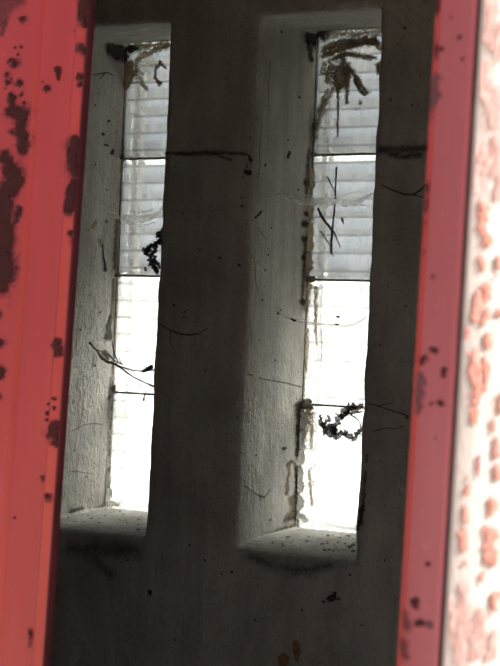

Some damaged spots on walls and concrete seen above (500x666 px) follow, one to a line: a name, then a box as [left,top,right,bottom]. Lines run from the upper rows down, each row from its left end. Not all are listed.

crack [165,125,262,178]
peeling [296,412,309,523]